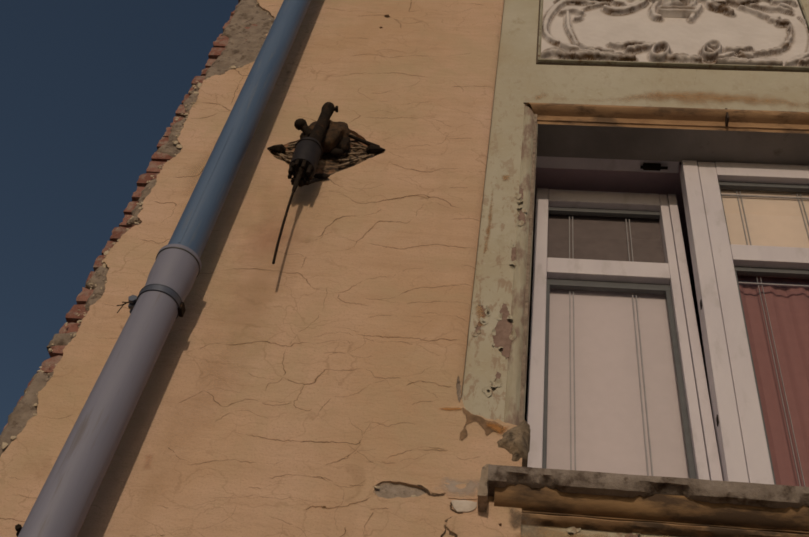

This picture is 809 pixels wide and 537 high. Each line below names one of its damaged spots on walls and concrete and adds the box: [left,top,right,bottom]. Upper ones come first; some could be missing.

spalling [155,0,274,157]
spalling [77,266,108,316]
peeling [472,300,516,359]
crack [233,341,355,411]
spalling [0,366,54,457]
spalling [456,377,531,467]
crack [306,499,388,521]
spalling [374,482,427,499]